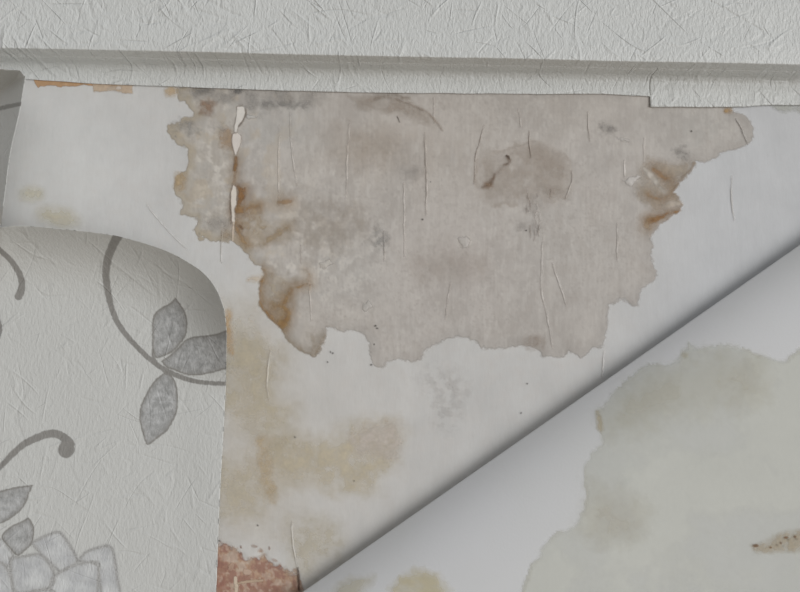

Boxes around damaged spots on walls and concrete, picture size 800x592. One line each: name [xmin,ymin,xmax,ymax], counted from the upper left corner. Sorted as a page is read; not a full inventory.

water stain [166,87,753,367]
flaking render [216,544,303,592]
water stain [523,344,800,592]